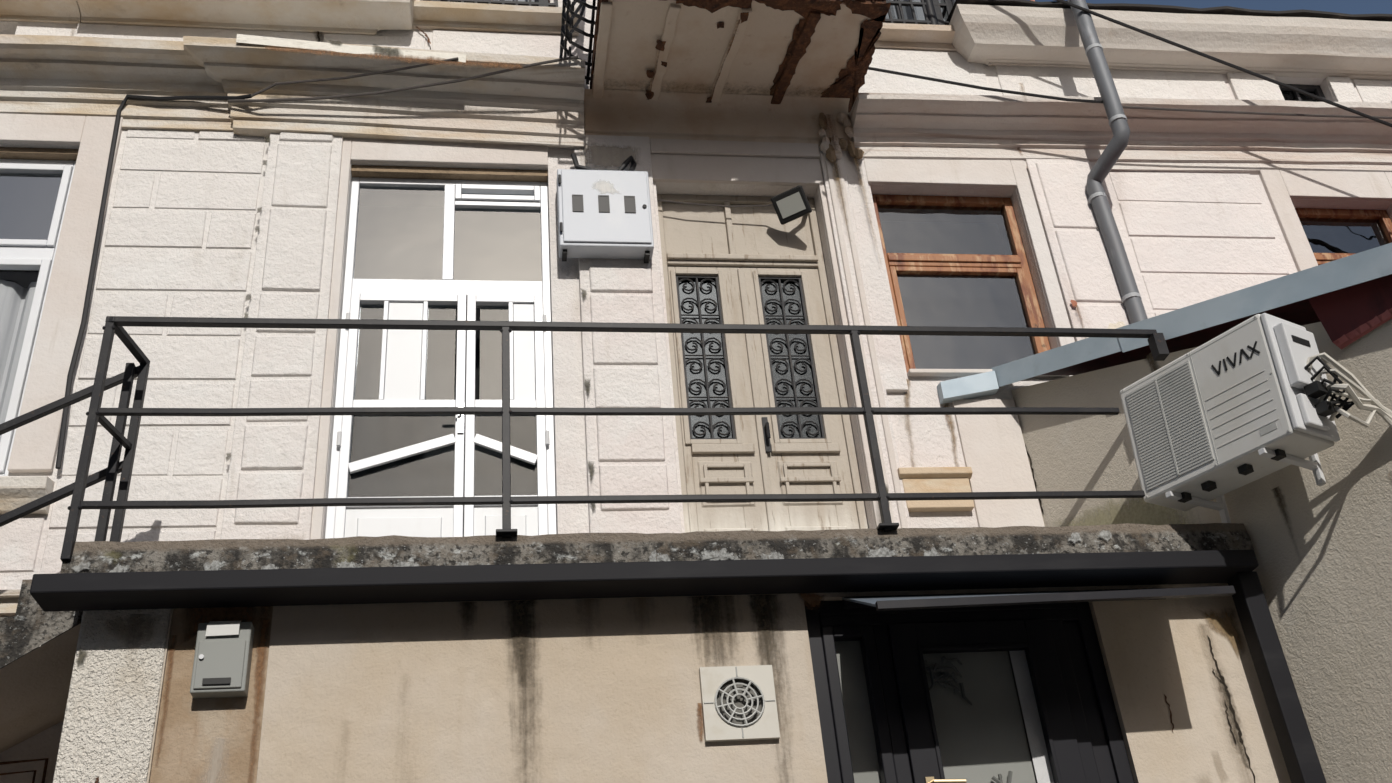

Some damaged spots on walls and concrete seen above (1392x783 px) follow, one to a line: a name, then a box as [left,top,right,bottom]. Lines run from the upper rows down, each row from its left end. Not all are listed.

spalling [591,0,608,75]
spalling [664,0,891,196]
damp [508,600,535,741]
damp [751,594,780,721]
crack [1207,635,1255,783]